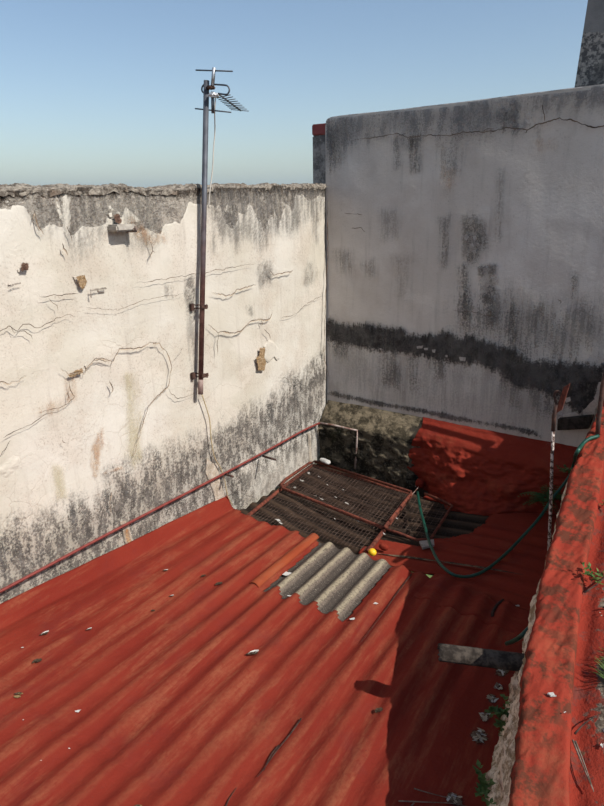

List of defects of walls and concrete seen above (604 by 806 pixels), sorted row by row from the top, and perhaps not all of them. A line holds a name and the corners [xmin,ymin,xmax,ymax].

water stain [326,86,604,170]
crack [353,105,604,141]
peeling [0,183,327,235]
crack [1,293,76,337]
spalling [256,340,280,371]
crack [208,205,365,372]
water stain [327,218,604,415]
crack [1,342,195,459]
water stain [0,354,538,602]